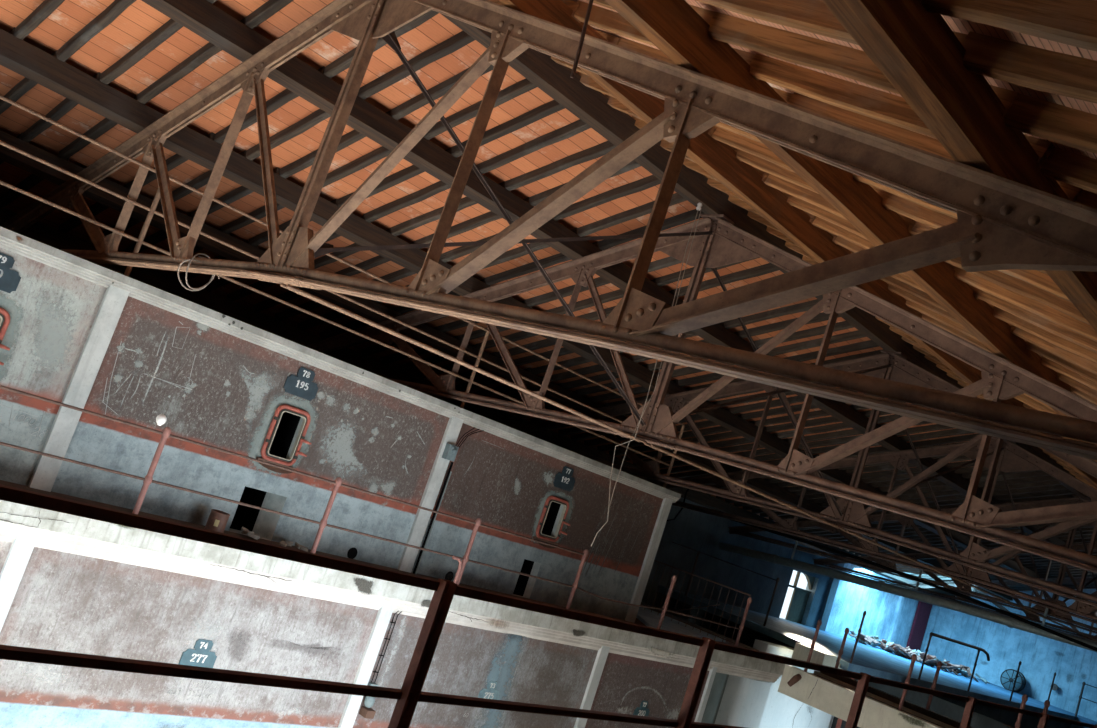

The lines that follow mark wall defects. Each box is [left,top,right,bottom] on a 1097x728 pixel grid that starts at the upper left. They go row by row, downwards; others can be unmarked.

peeling [317,392,380,477]
peeling [369,482,395,496]
water stain [481,634,525,728]